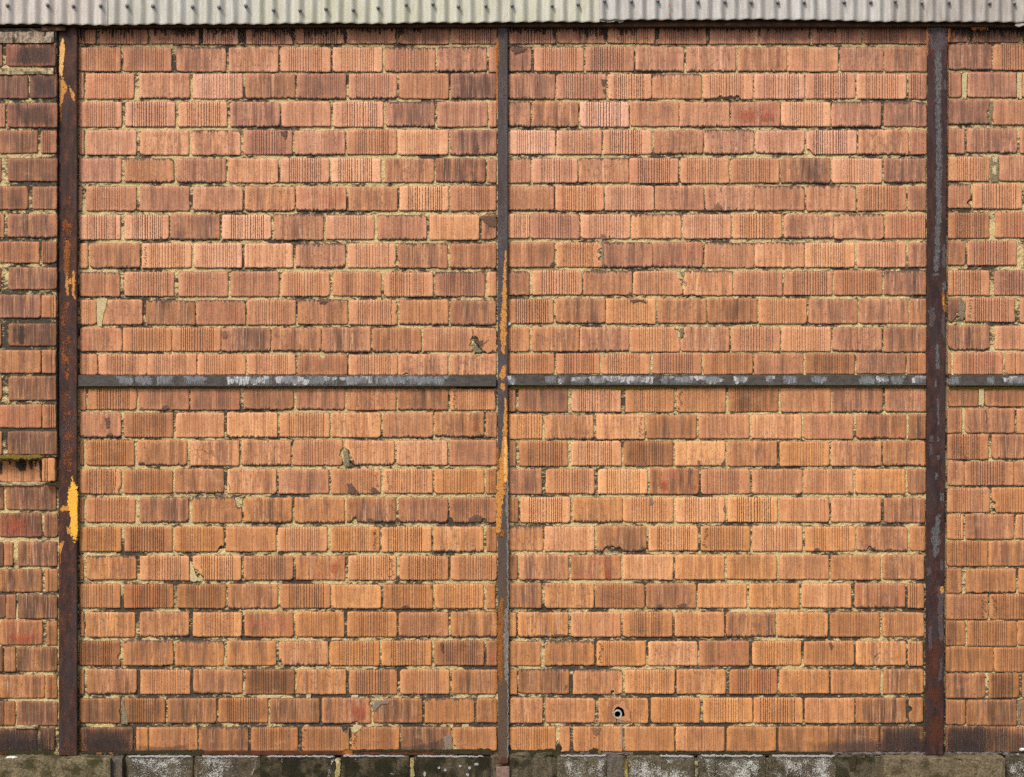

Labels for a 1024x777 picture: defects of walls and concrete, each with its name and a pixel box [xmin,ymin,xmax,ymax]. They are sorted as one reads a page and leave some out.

corrosion [62,196,72,270]
corrosion [61,302,71,380]
corrosion [496,598,505,699]